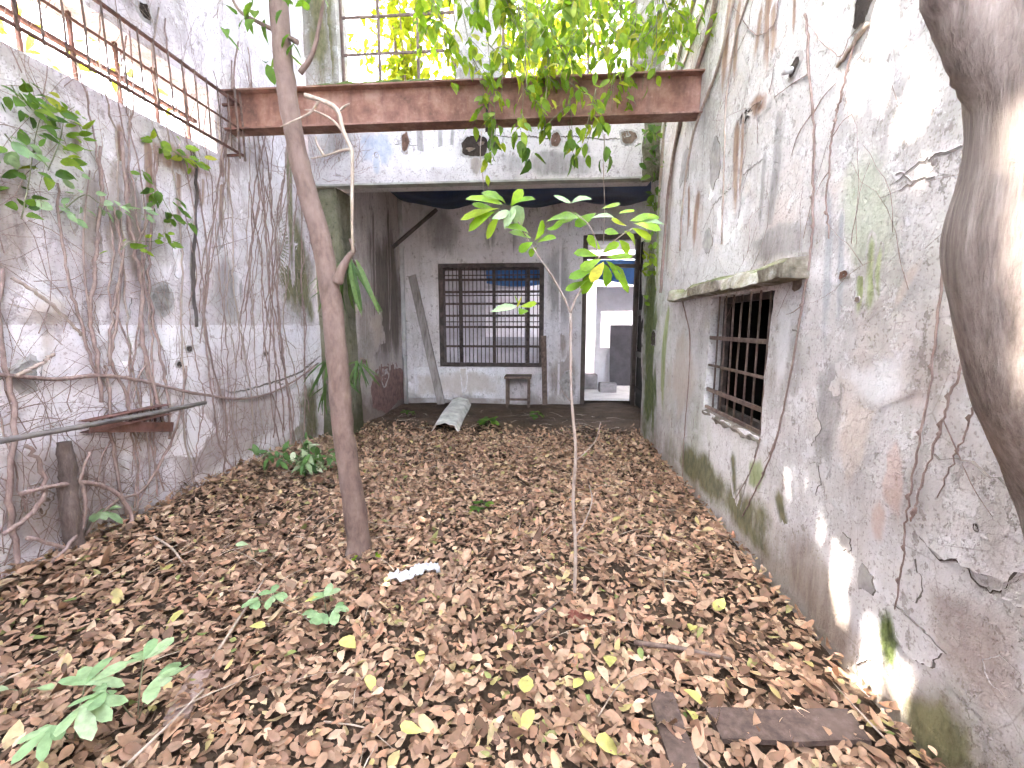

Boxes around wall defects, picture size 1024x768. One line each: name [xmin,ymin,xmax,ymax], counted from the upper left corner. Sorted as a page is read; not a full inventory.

corrosion [68,111,84,173]
spalling [619,122,662,183]
crack [880,144,963,198]
water stain [660,293,860,674]
peeling [839,532,852,552]
peeling [907,454,1024,609]
peeling [857,563,876,596]